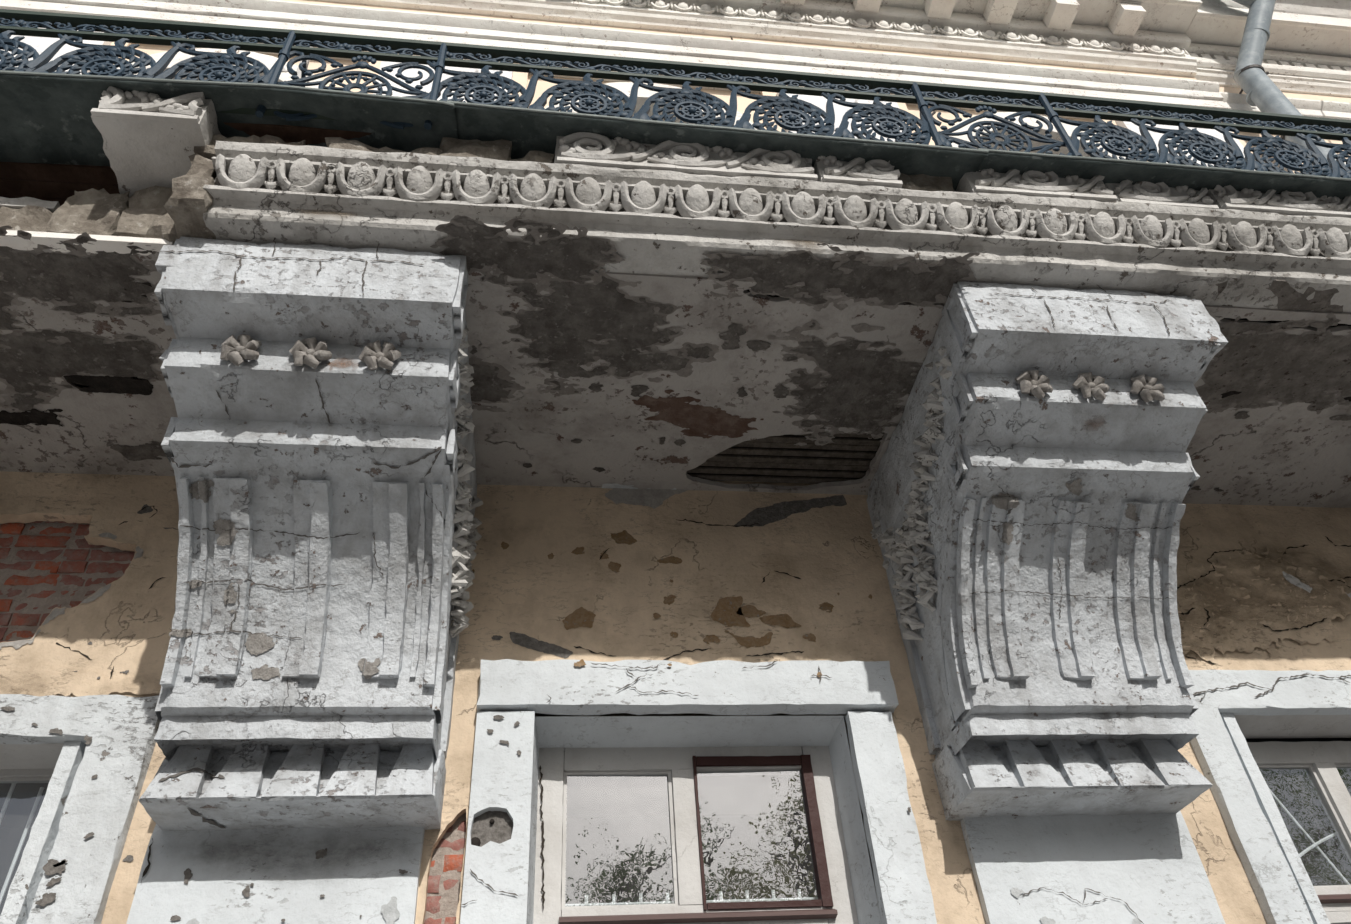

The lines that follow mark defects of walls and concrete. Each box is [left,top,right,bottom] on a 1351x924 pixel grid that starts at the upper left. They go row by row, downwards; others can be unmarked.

spalling [325,137,554,163]
peeling [0,134,305,427]
peeling [430,215,980,447]
peeling [1188,278,1351,421]
crack [973,486,1169,530]
spalling [0,521,143,649]
spalling [491,632,586,667]
crack [970,550,1235,626]
crack [1186,656,1351,700]
crack [1263,618,1327,632]
crack [1283,536,1351,588]
spalling [424,813,467,924]